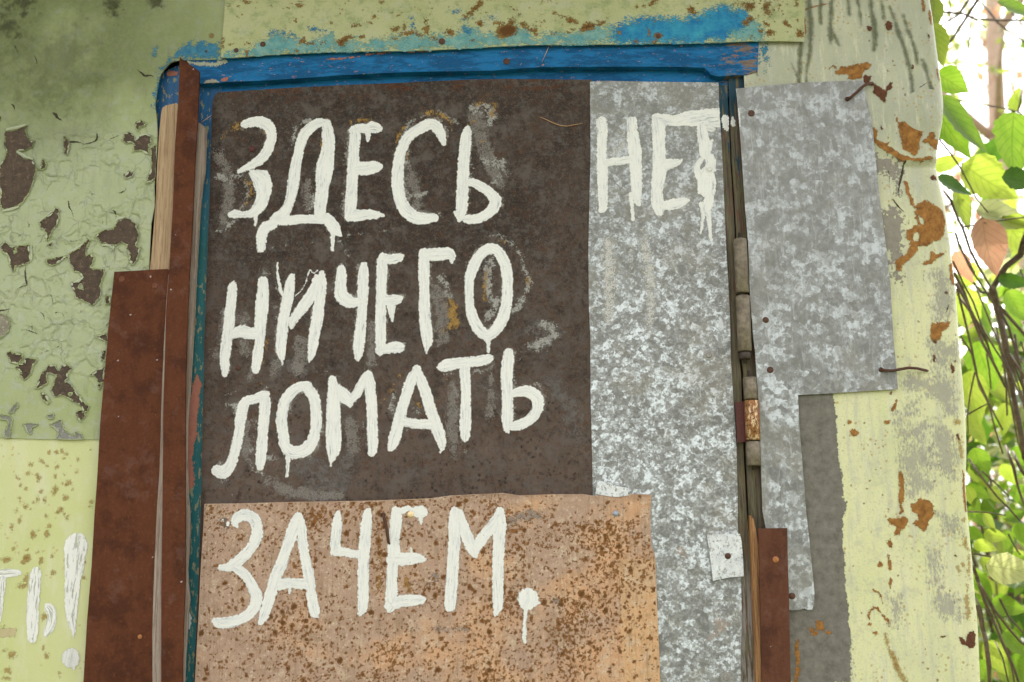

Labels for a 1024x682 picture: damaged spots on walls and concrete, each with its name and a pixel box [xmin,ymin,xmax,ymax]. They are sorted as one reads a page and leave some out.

corrosion [463,0,607,39]
peeling [0,124,47,212]
peeling [63,136,71,156]
peeling [121,119,157,185]
corrosion [873,115,938,163]
peeling [0,206,141,307]
corrosion [895,181,955,294]
peeling [0,350,90,440]
peeling [90,333,108,391]
corrosion [930,321,951,362]
corrosion [867,471,935,682]
corrosion [954,537,976,648]